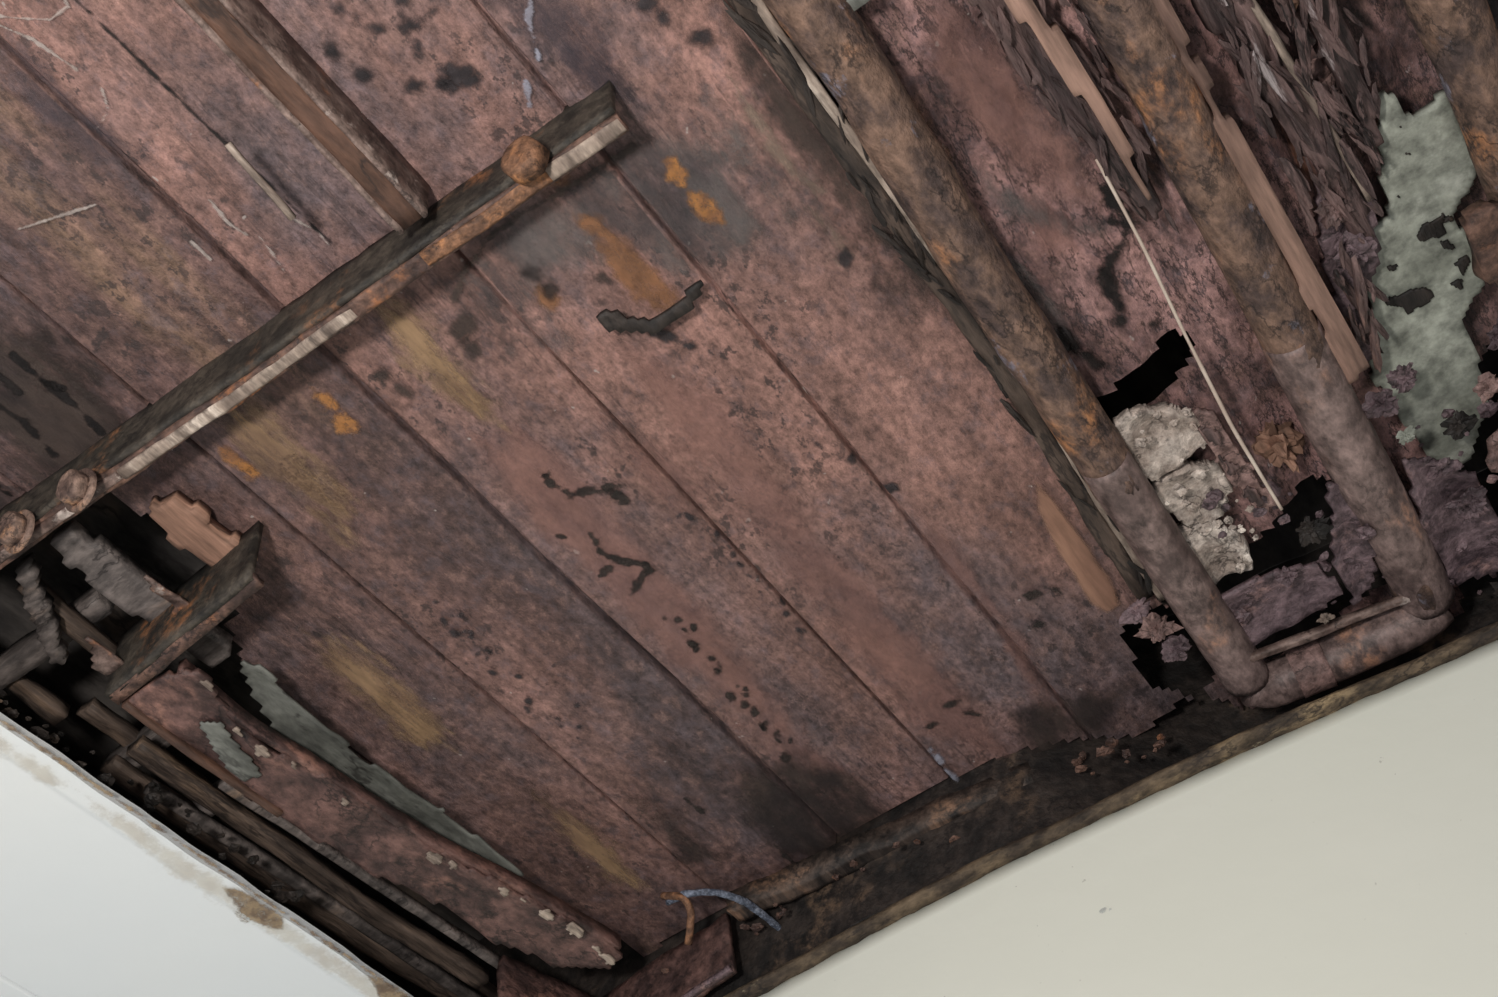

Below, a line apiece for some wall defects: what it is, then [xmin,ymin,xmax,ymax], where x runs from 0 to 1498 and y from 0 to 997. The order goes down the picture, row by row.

water stain [369,0,437,55]
water stain [525,0,540,61]
water stain [691,29,712,46]
water stain [406,62,480,95]
rust [665,157,723,224]
rust [580,214,677,309]
spalling [1367,89,1488,464]
rust [0,80,637,570]
spalling [1112,401,1277,585]
peeling [84,636,124,676]
rust [0,720,407,997]
peeling [498,887,616,965]